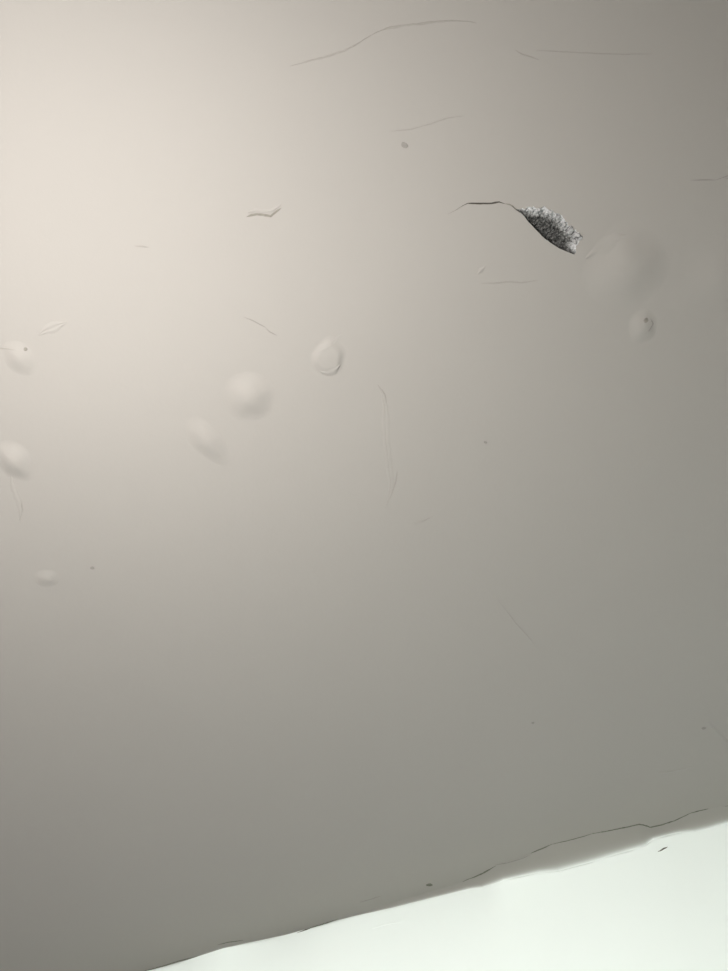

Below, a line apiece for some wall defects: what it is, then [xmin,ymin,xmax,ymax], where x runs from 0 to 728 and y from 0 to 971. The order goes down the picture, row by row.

spalling [517,206,583,254]
crack [463,806,726,882]